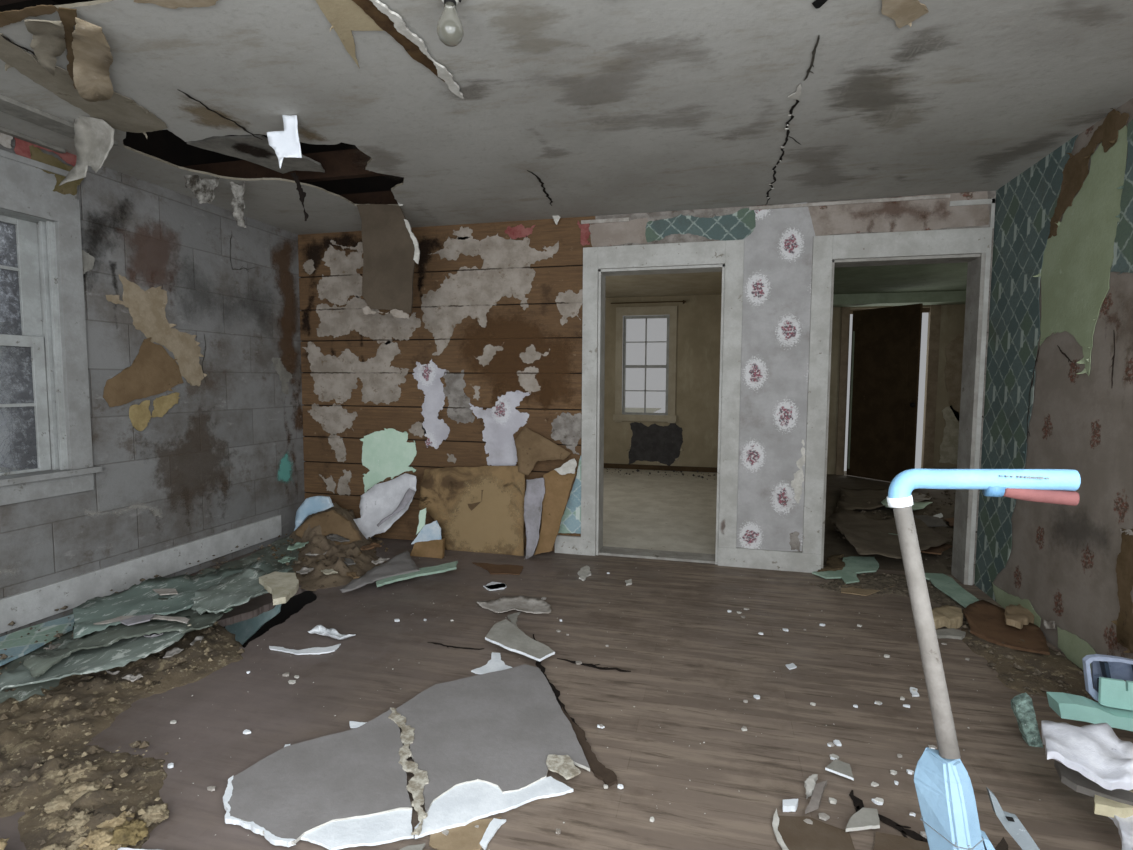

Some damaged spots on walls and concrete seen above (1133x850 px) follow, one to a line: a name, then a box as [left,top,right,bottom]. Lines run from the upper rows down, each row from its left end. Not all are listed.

peeling [134,0,218,9]
peeling [316,0,384,69]
peeling [0,33,167,138]
crack [766,0,828,203]
leakage [85,206,126,261]
peeling [1033,126,1128,376]
flaking render [129,392,180,431]
leakage [157,415,231,508]
peeling [360,428,428,493]
flaking render [627,422,683,466]